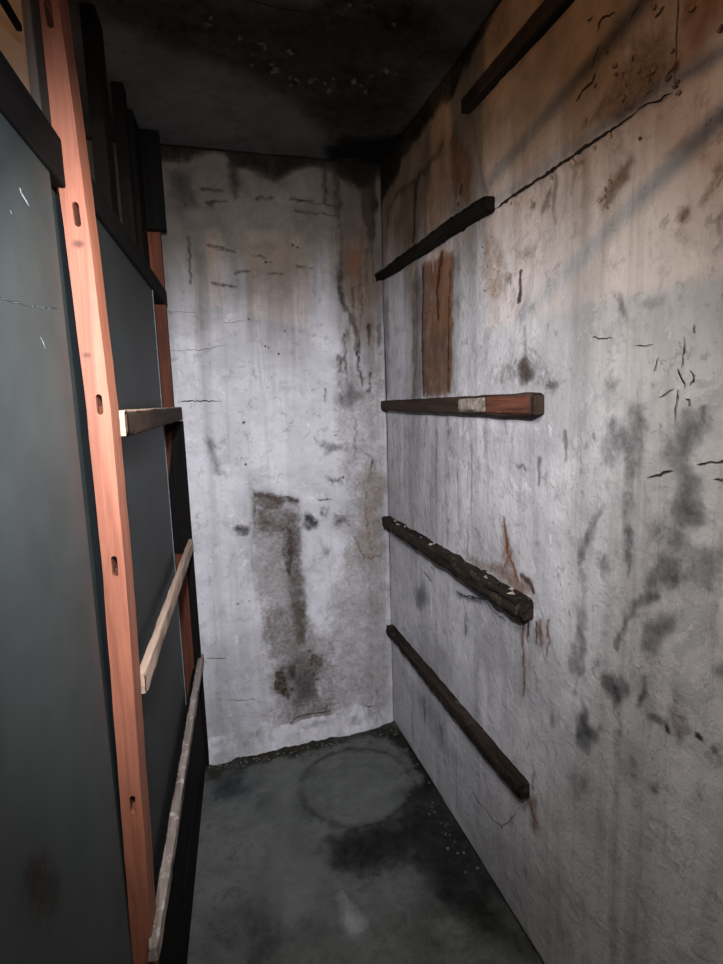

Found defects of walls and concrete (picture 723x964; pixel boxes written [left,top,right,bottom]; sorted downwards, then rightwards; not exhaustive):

crack [495,0,682,209]
water stain [338,324,372,392]
corrosion [421,251,454,396]
water stain [673,470,701,541]
corrosion [502,518,534,593]
water stain [258,493,323,706]
corrosion [521,619,550,693]
water stain [603,676,626,703]
water stain [576,713,595,744]
water stain [333,730,516,942]